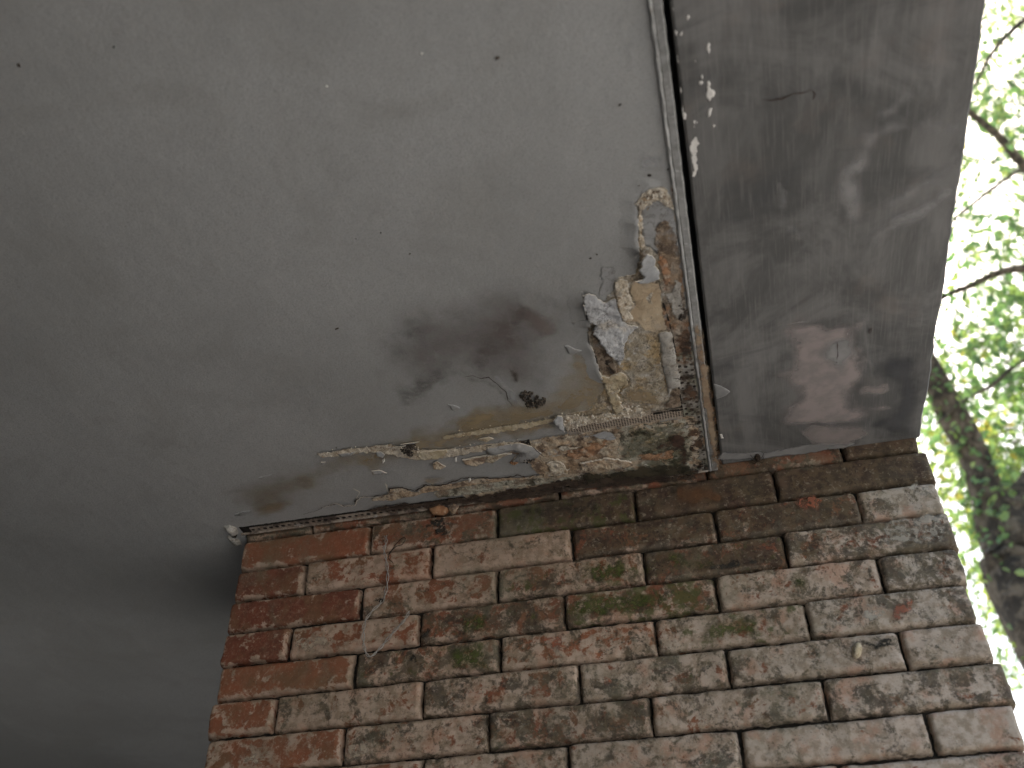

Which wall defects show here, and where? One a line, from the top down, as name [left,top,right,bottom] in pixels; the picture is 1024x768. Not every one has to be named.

flaking render [306,177,702,514]
leakage [368,330,706,512]